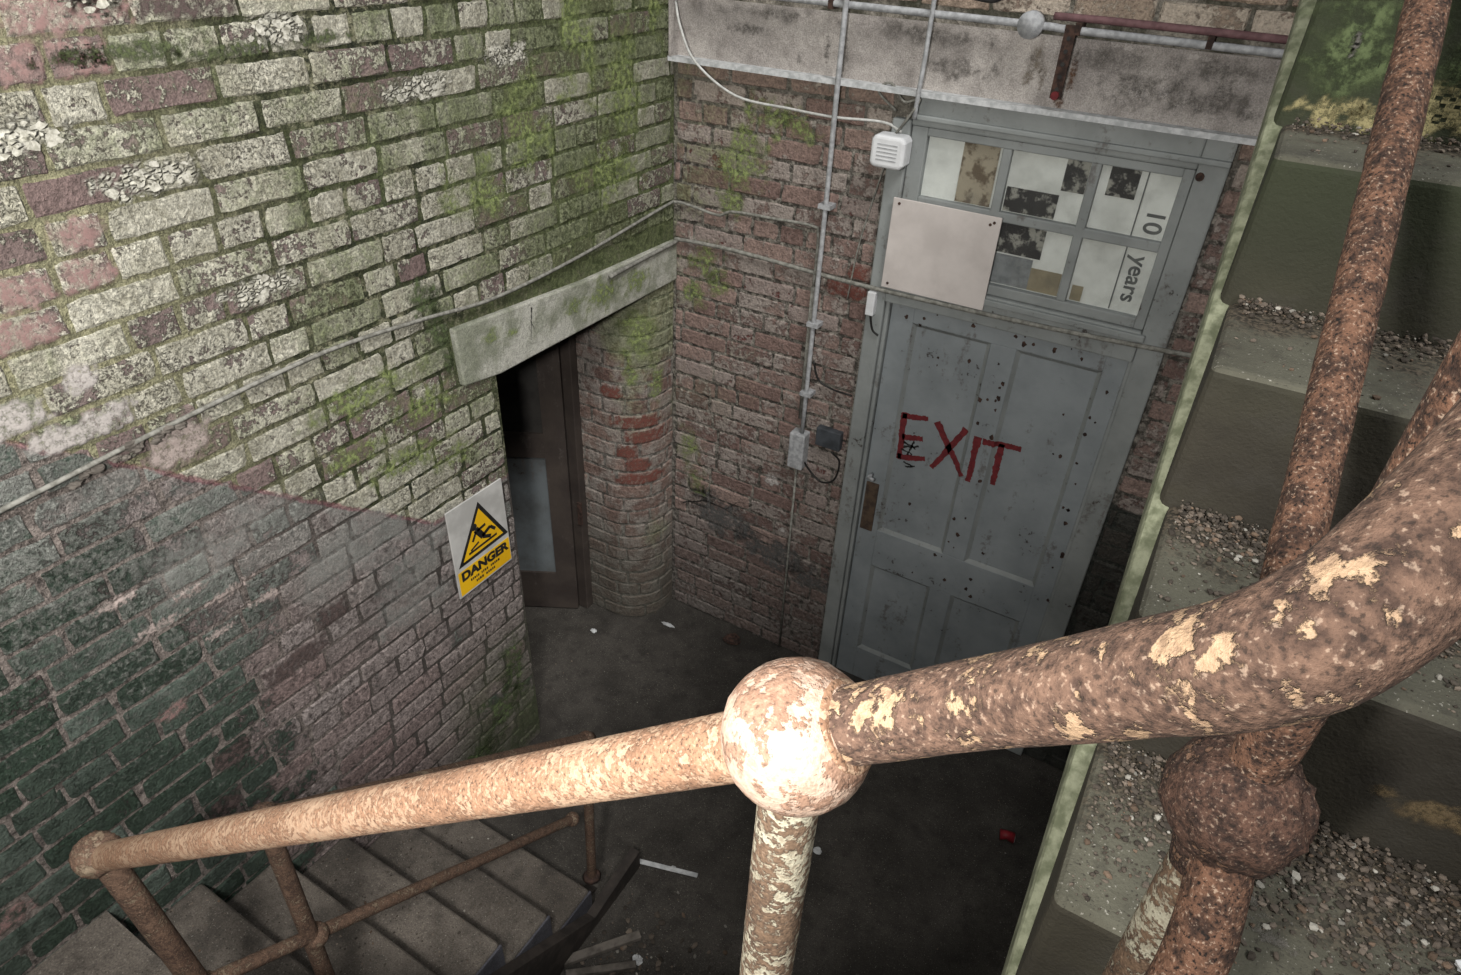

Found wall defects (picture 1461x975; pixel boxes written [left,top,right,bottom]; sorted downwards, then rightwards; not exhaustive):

water stain [444,153,500,215]
water stain [499,67,555,169]
water stain [557,0,641,207]
water stain [716,103,814,216]
water stain [310,278,467,486]
corrosion [1378,789,1461,834]